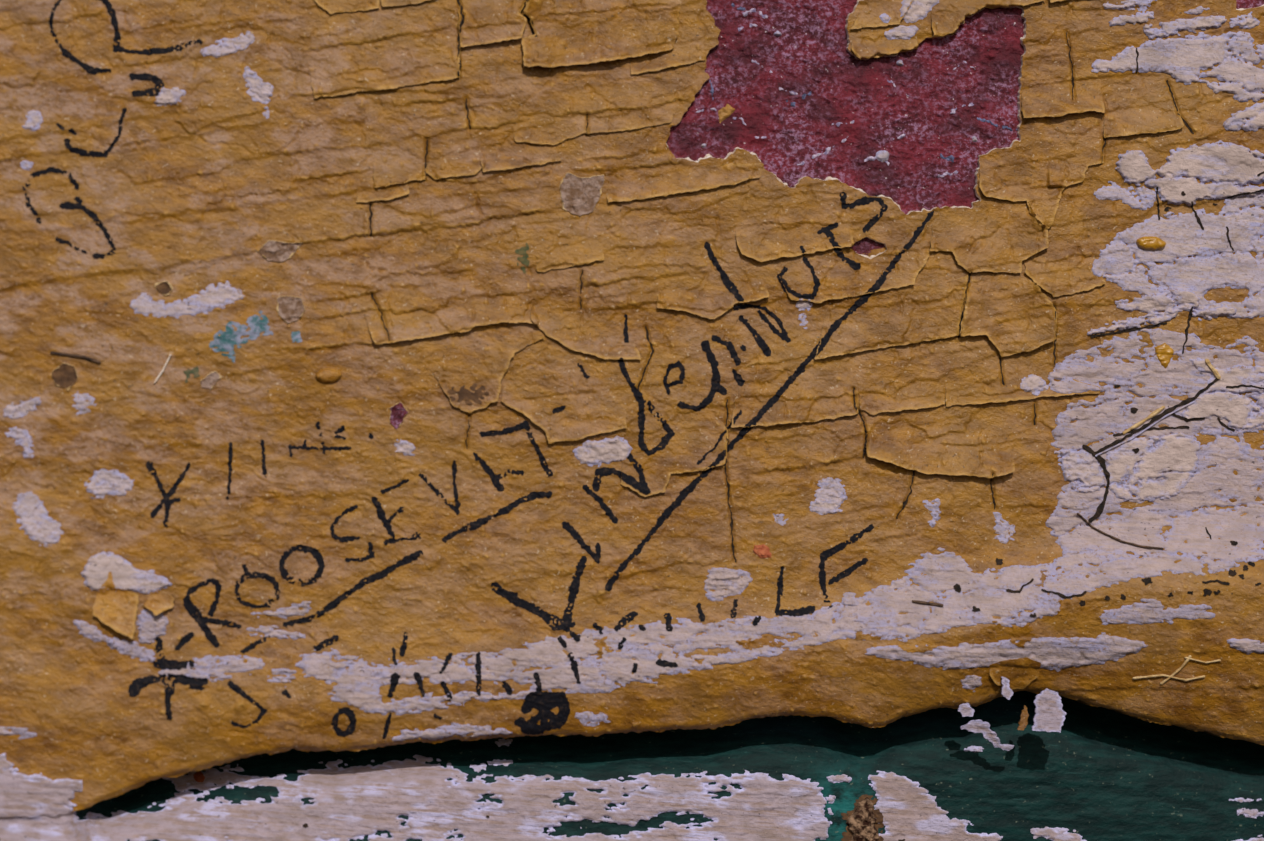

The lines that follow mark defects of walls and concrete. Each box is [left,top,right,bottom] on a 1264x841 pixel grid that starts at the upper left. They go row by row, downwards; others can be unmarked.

crack [519,0,537,37]
crack [457,0,471,129]
crack [958,272,972,338]
crack [638,326,654,392]
peeling [154,0,1264,715]
crack [853,388,868,458]
crack [724,399,736,563]
peeling [73,552,174,662]
peeling [957,703,1014,752]
peeling [1017,688,1067,733]
peeling [0,722,852,841]
peeling [868,771,1003,841]